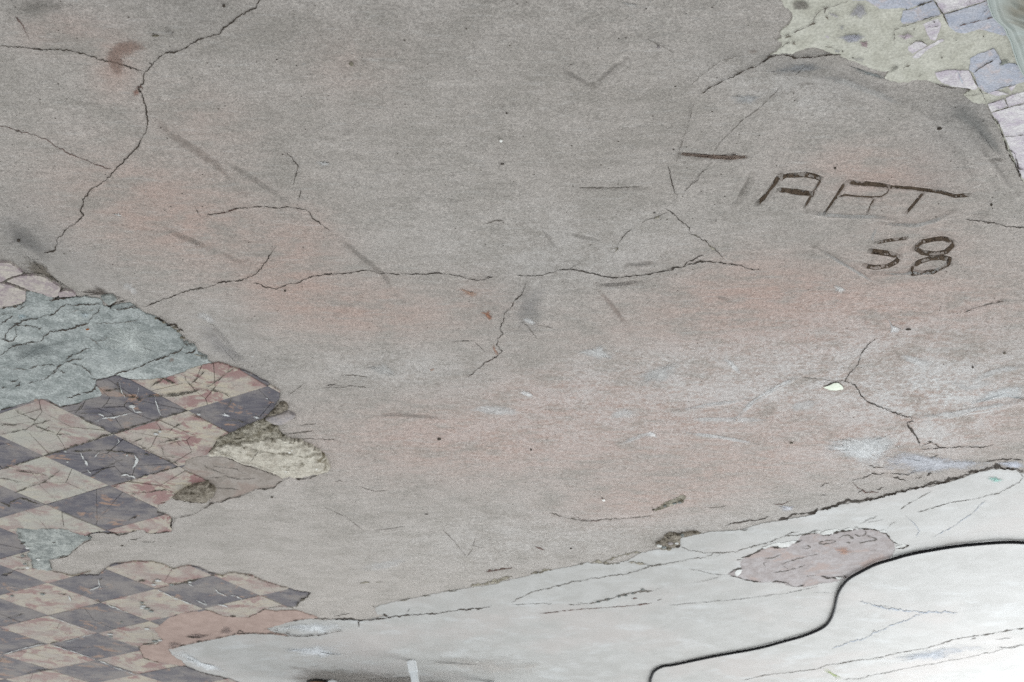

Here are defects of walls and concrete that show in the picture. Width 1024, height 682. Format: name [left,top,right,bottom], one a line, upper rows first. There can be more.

spalling [857,0,1007,58]
crack [0,0,260,253]
crack [196,154,329,230]
crack [454,54,841,375]
spalling [935,48,1024,179]
spalling [0,260,76,308]
crack [0,250,492,411]
spalling [0,361,311,682]
crack [283,424,333,440]
hole [652,495,686,511]
spalling [728,527,909,587]
crack [808,340,1023,537]